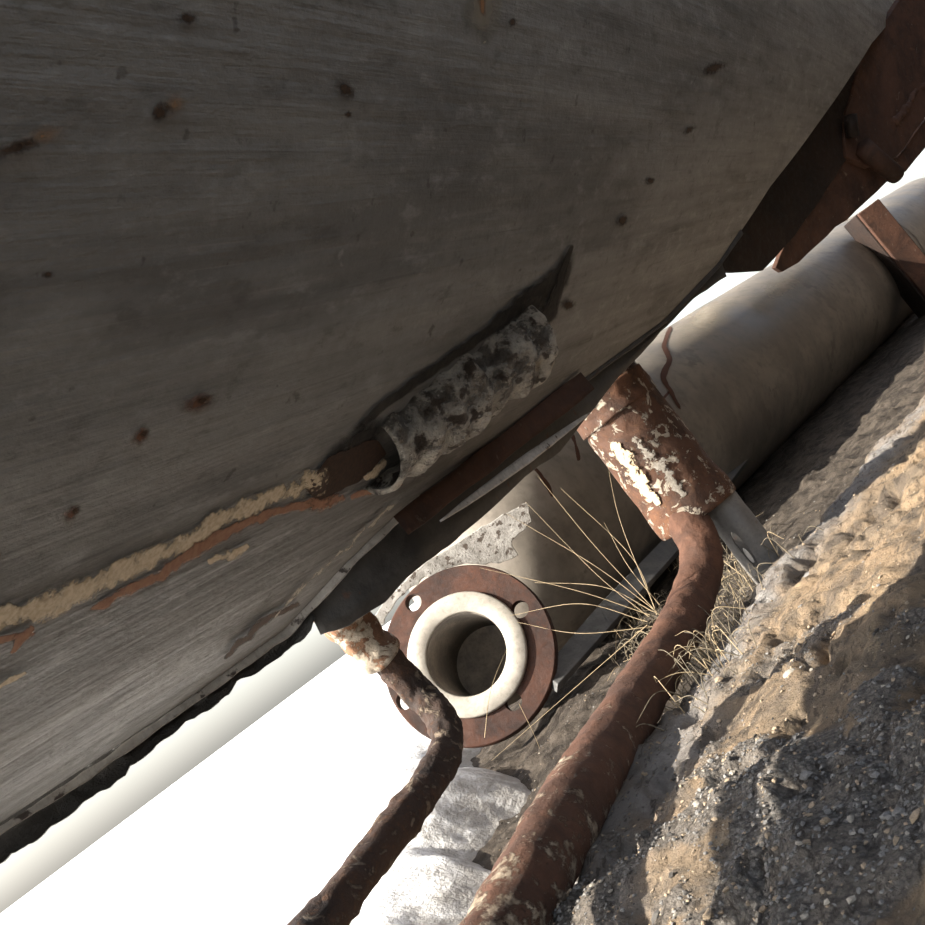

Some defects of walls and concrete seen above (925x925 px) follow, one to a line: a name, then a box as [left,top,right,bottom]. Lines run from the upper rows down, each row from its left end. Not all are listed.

corrosion [0,132,50,158]
peeling [610,436,687,506]
peeling [0,459,396,659]
peeling [0,672,26,689]